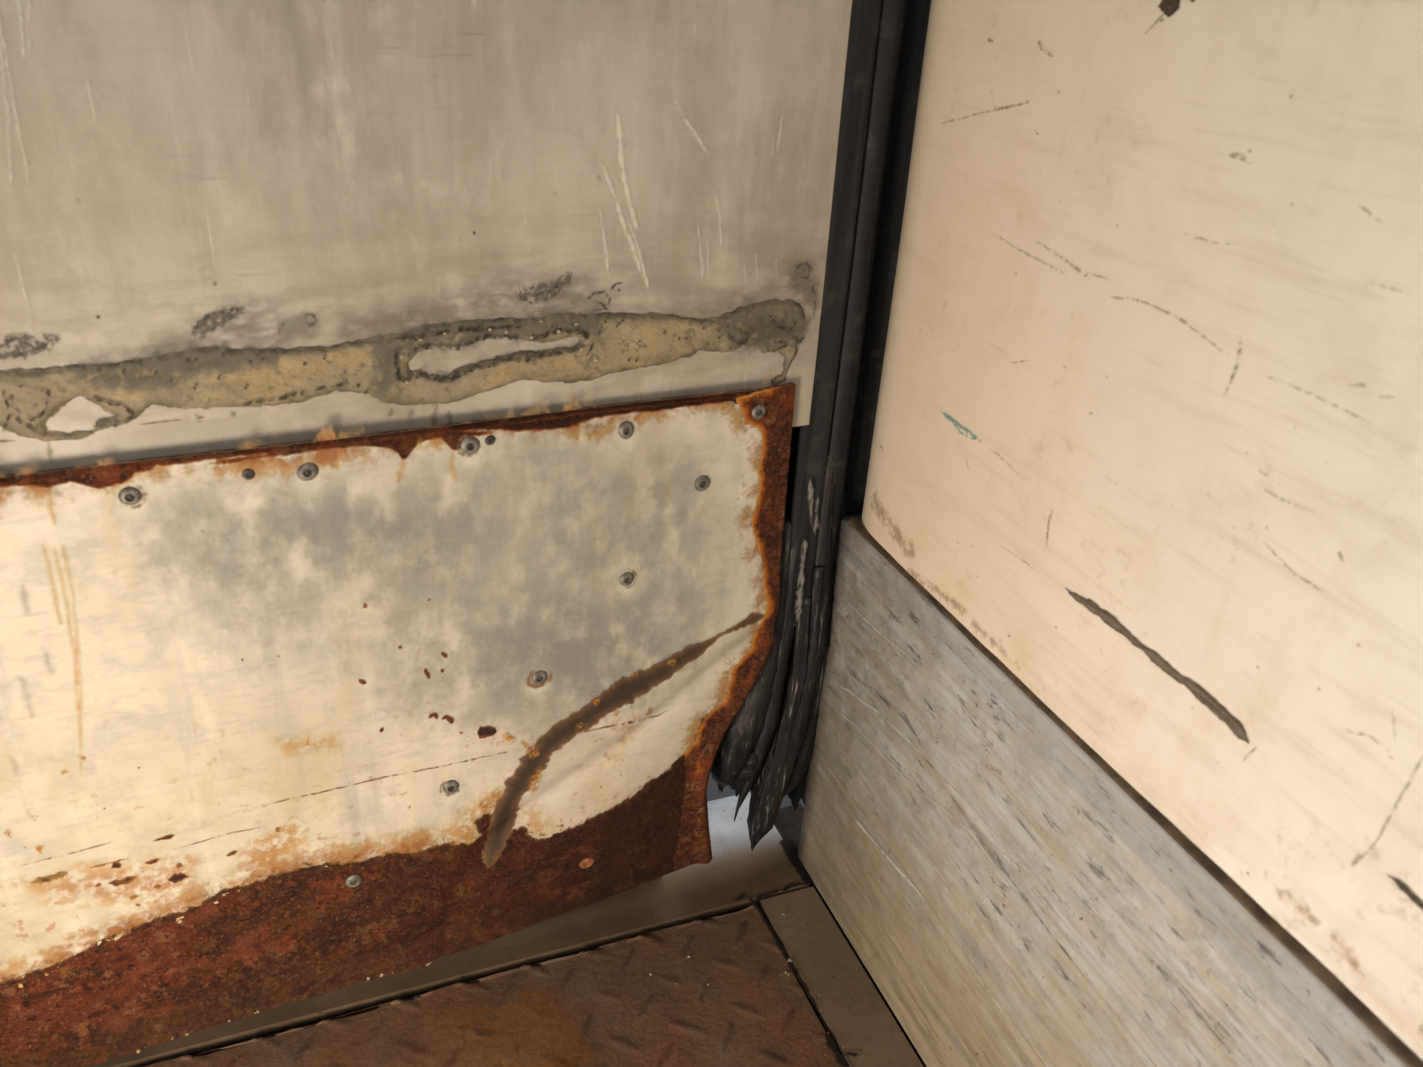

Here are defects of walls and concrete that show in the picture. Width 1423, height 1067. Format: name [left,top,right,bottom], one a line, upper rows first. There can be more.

peeling [1145,0,1195,34]
corrosion [0,384,796,1067]